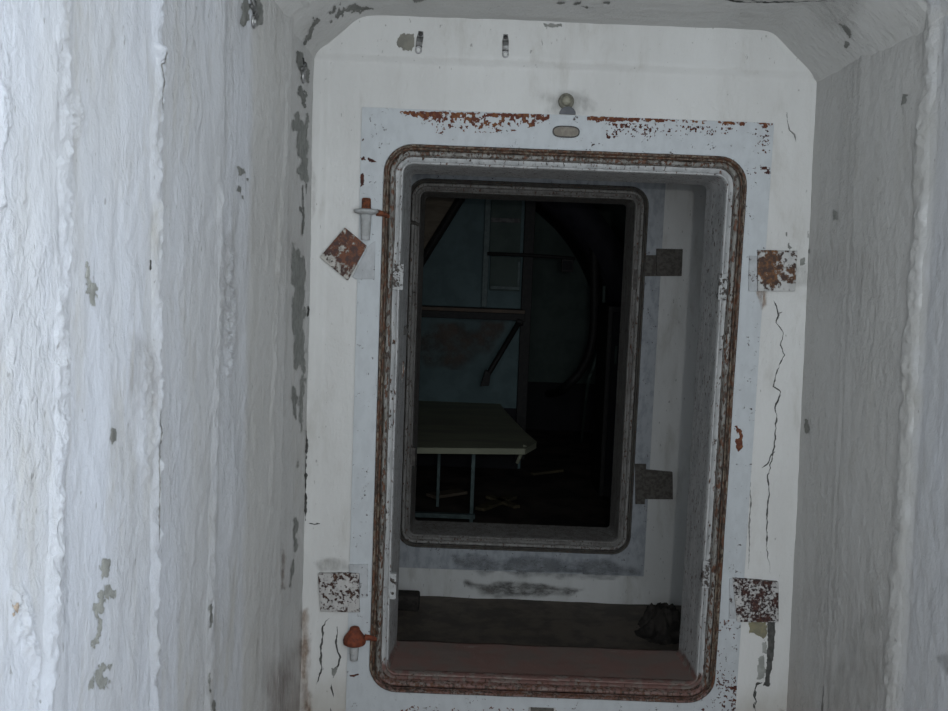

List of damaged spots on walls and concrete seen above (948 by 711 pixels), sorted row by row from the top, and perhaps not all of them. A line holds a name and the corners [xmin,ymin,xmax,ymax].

peeling [240,0,263,27]
rust [400,111,550,134]
rust [587,116,773,153]
peeling [291,2,374,432]
peeling [85,261,98,306]
crack [748,302,785,567]
peeling [91,559,116,649]
peeling [88,662,112,690]
rust [701,651,737,711]